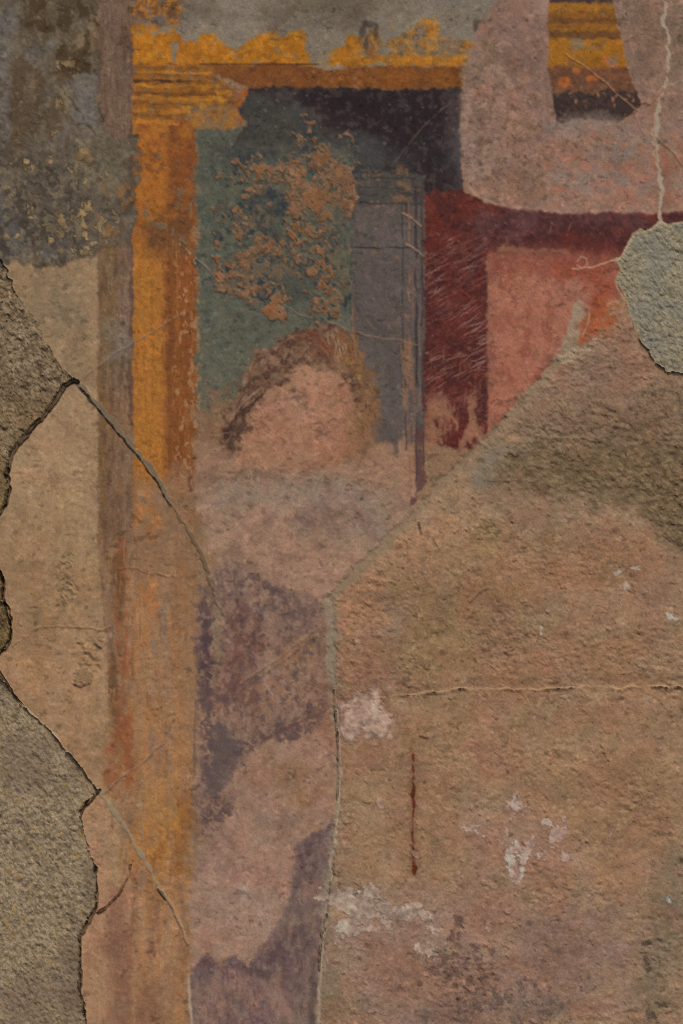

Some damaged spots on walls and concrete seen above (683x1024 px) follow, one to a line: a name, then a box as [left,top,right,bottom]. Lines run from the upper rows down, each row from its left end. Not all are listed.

crack [566,1,683,224]
crack [572,257,619,271]
crack [73,313,226,688]
efflorescence [337,686,394,741]
crack [316,357,560,1024]
crack [380,685,683,700]
efflorescence [505,794,523,814]
crack [97,737,190,946]
efflorescence [499,816,579,885]
efflorescence [314,883,442,958]
crack [187,974,195,1024]